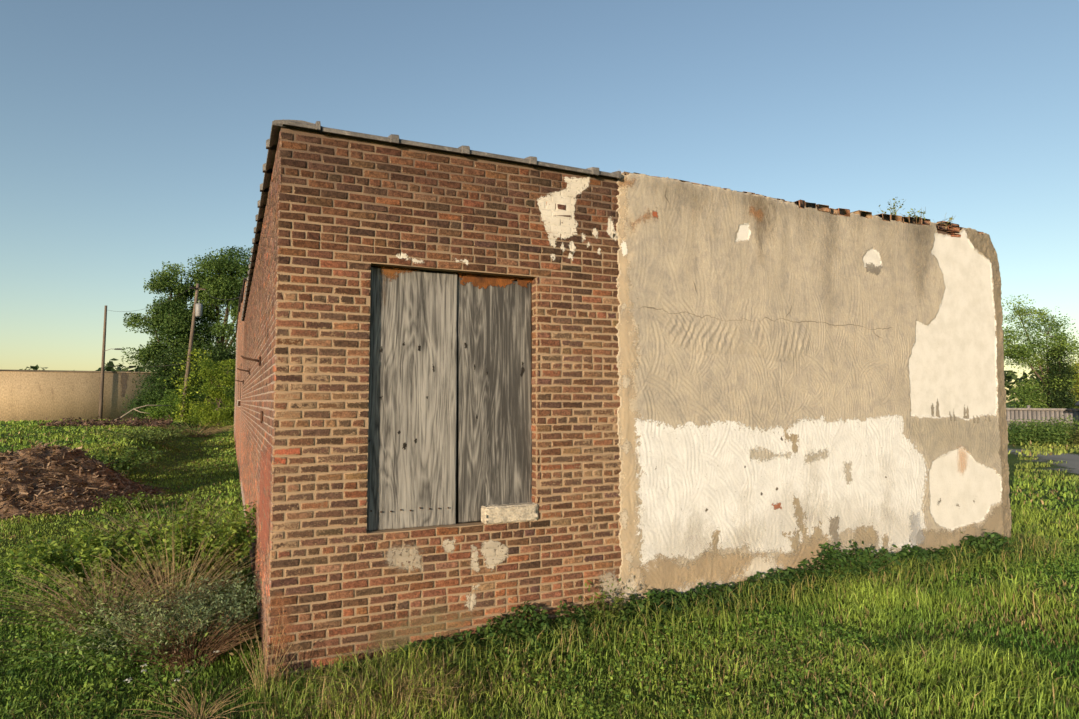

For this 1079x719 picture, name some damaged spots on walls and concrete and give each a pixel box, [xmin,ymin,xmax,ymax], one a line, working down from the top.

peeling [537,175,628,261]
crack [638,283,892,339]
peeling [619,221,1011,607]